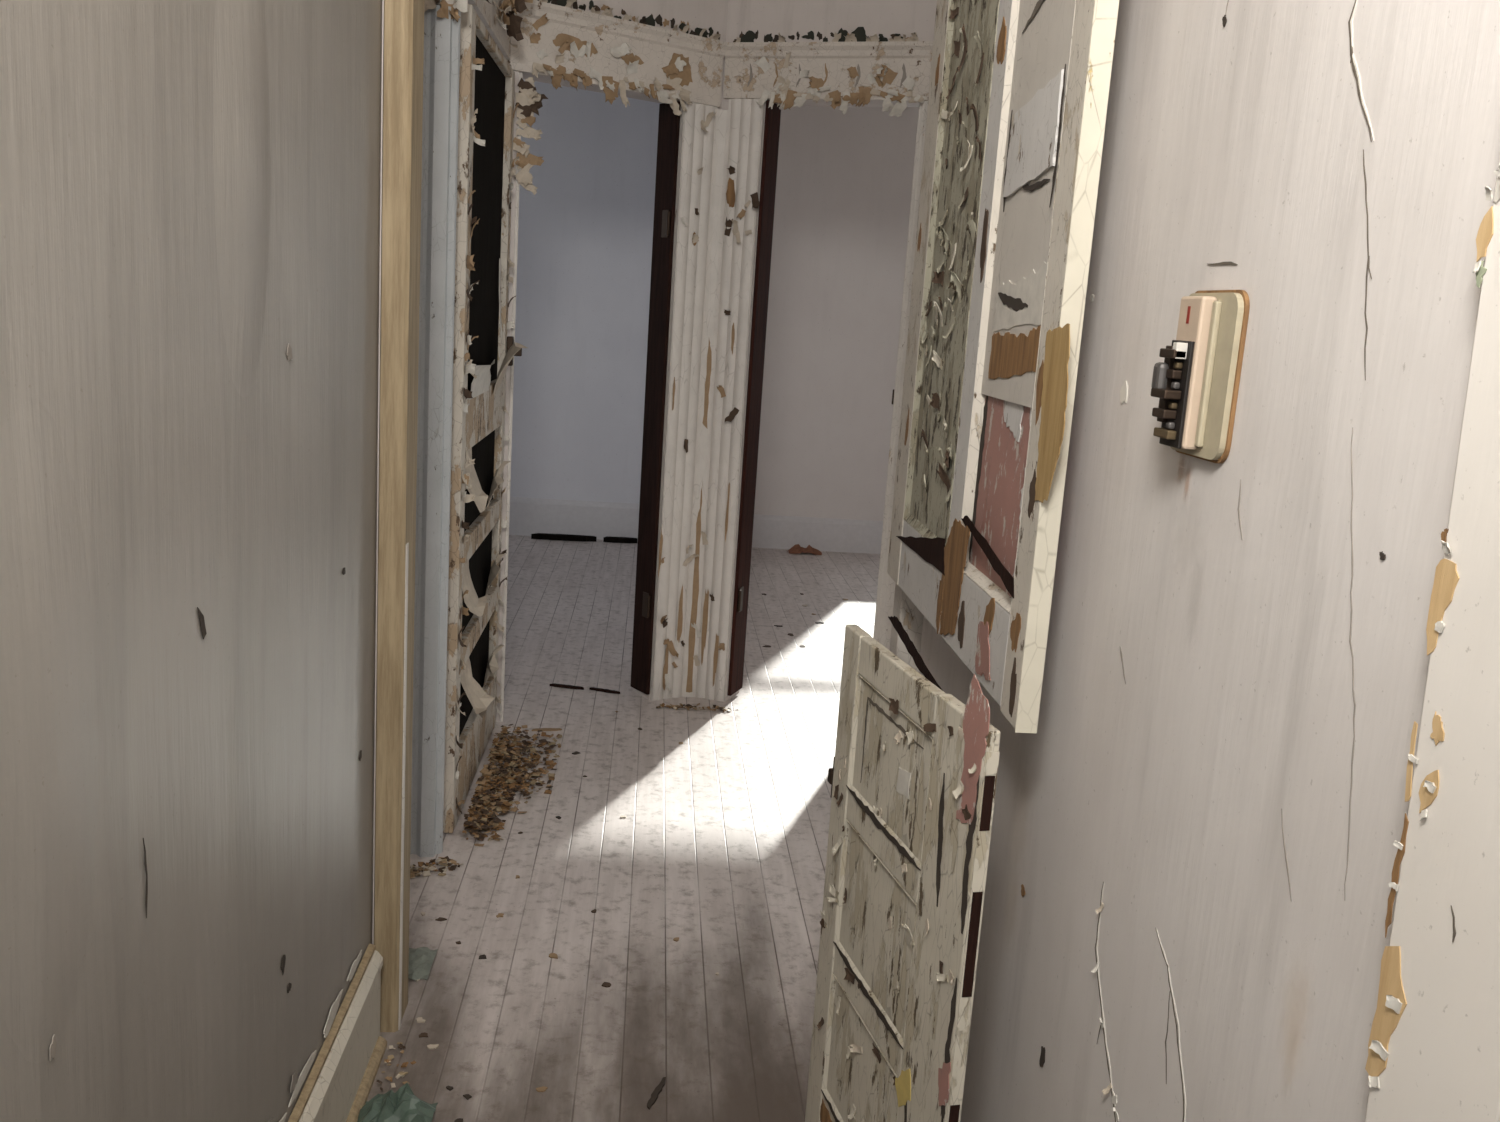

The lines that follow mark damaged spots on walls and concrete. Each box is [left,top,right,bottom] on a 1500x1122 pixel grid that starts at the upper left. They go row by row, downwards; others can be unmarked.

peeling [424,0,468,22]
peeling [472,58,485,71]
peeling [471,108,485,146]
peeling [486,0,1007,370]
peeling [466,255,479,301]
peeling [702,340,739,428]
peeling [660,482,730,693]